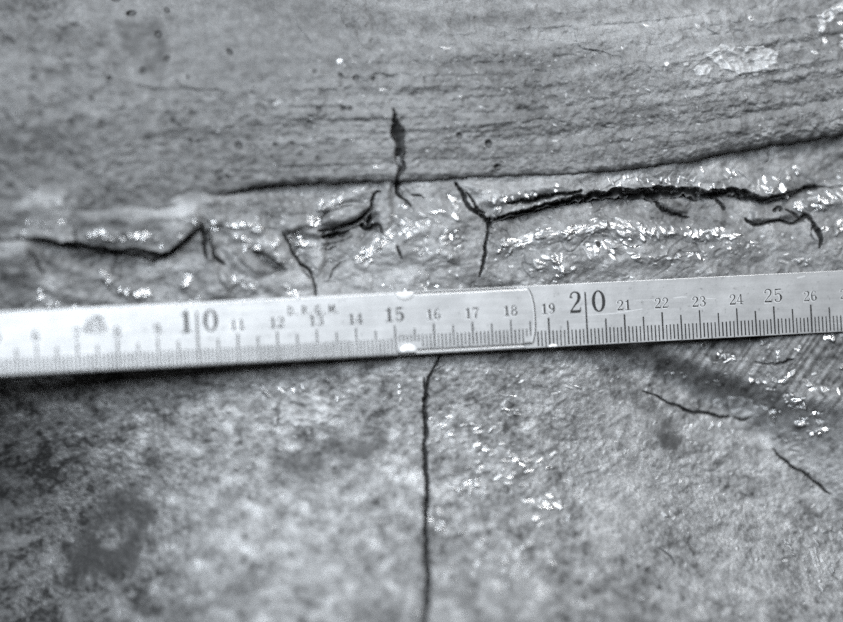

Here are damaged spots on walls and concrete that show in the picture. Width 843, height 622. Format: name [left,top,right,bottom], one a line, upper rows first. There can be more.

crack [0,223,230,291]
crack [255,108,425,296]
crack [455,174,839,289]
crack [642,391,751,421]
crack [420,356,441,622]
crack [773,448,831,495]